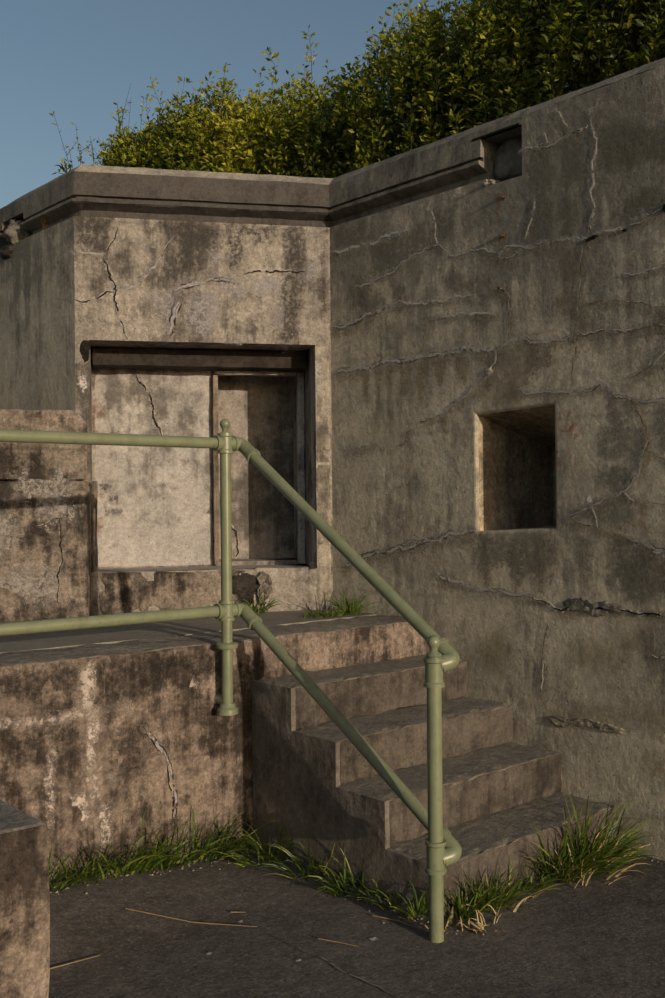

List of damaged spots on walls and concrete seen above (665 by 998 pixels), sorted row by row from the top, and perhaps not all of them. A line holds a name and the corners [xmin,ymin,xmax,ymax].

crack [58,229,174,339]
crack [166,269,305,336]
damp [159,218,326,346]
crack [330,109,665,569]
damp [17,468,75,531]
damp [0,563,60,602]
spalling [232,571,273,605]
crack [341,528,665,696]
damp [233,661,256,726]
damp [0,655,218,845]